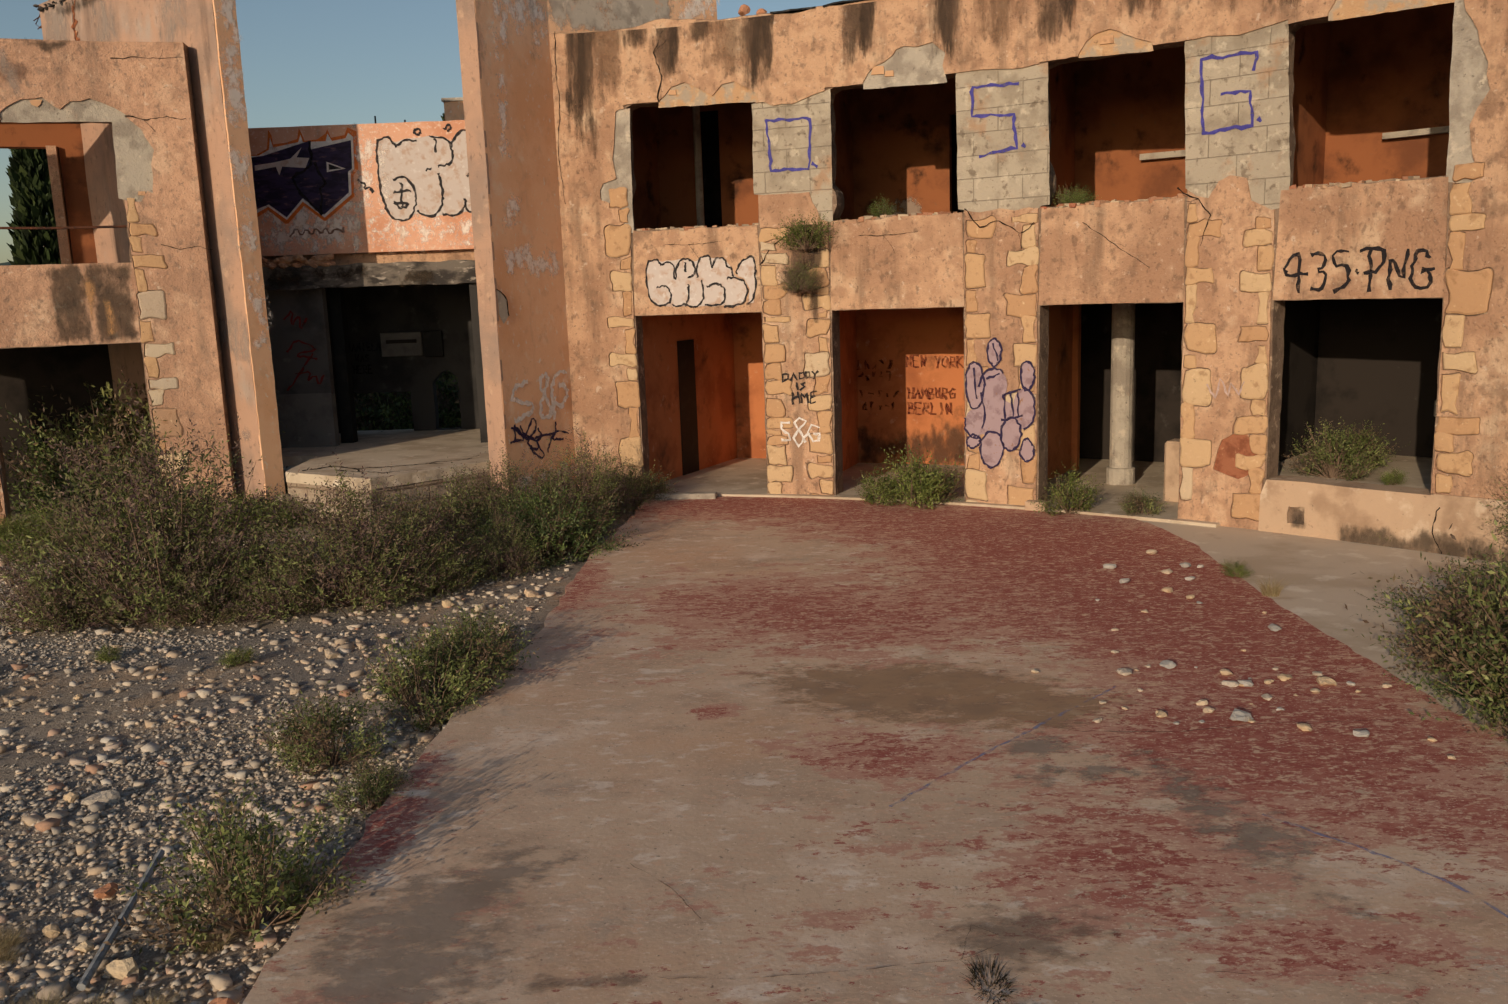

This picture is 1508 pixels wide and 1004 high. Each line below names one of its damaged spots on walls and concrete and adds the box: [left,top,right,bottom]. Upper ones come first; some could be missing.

damp [566,32,596,150]
peeling [492,0,719,157]
damp [624,21,708,74]
damp [745,15,772,83]
damp [842,2,874,62]
damp [935,0,959,49]
damp [1038,0,1074,39]
peeling [0,97,154,202]
peeling [863,42,1050,212]
peeling [891,198,921,215]